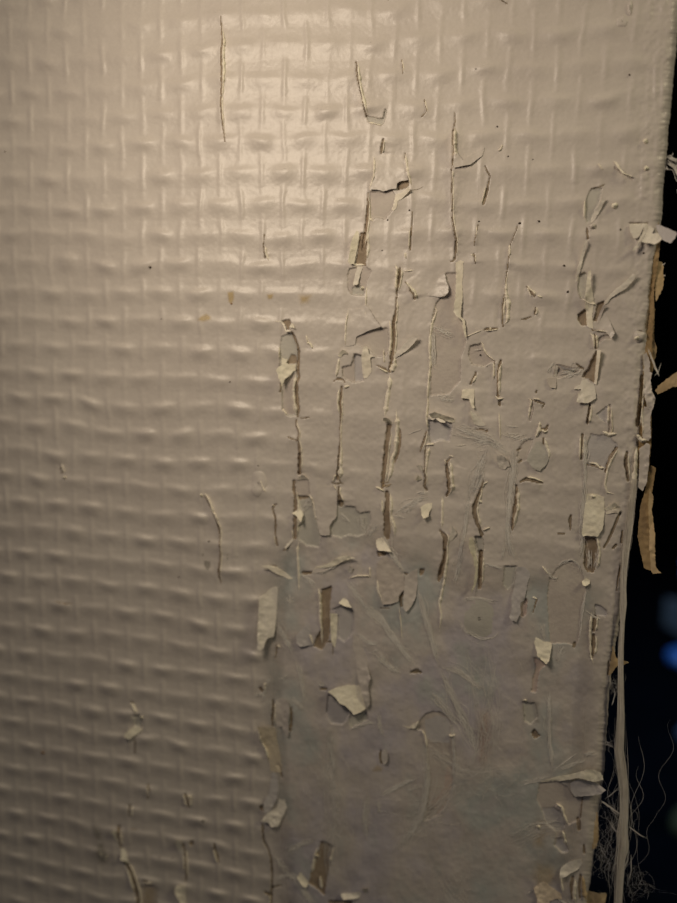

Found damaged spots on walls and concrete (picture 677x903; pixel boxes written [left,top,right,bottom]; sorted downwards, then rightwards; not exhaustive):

crack [219,16,227,142]
crack [355,62,387,153]
peeling [347,233,371,295]
peeling [574,240,636,328]
peeling [276,320,300,417]
peeling [393,273,495,426]
peeling [574,380,596,403]
crack [200,493,222,584]
peeling [257,587,278,650]
peeling [296,586,354,654]
peeling [503,559,587,739]
peeling [297,842,368,903]